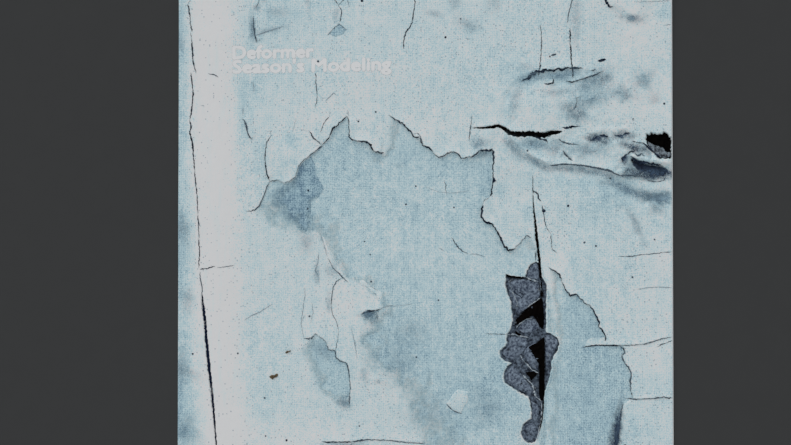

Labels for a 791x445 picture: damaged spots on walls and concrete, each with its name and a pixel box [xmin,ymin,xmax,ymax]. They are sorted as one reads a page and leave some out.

crack [187,3,233,445]
peeling [247,116,632,445]
crack [532,177,555,298]
crack [469,0,636,177]